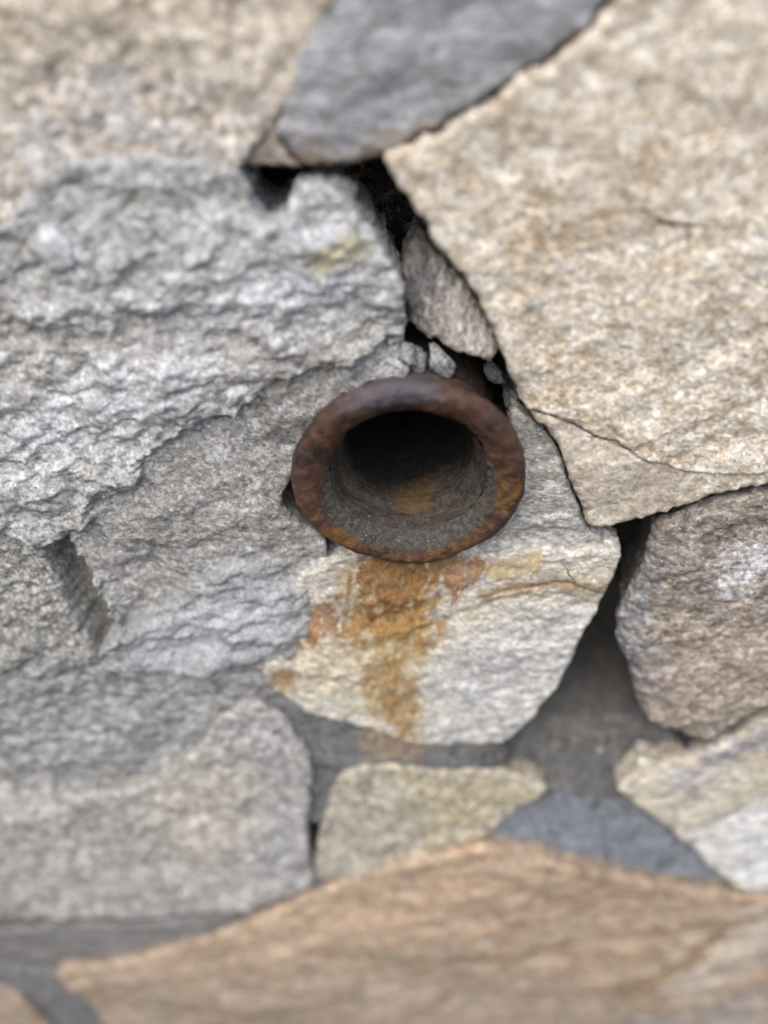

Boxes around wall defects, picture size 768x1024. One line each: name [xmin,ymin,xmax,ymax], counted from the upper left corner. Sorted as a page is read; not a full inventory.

crack [531,409,650,461]
rust [296,554,540,740]